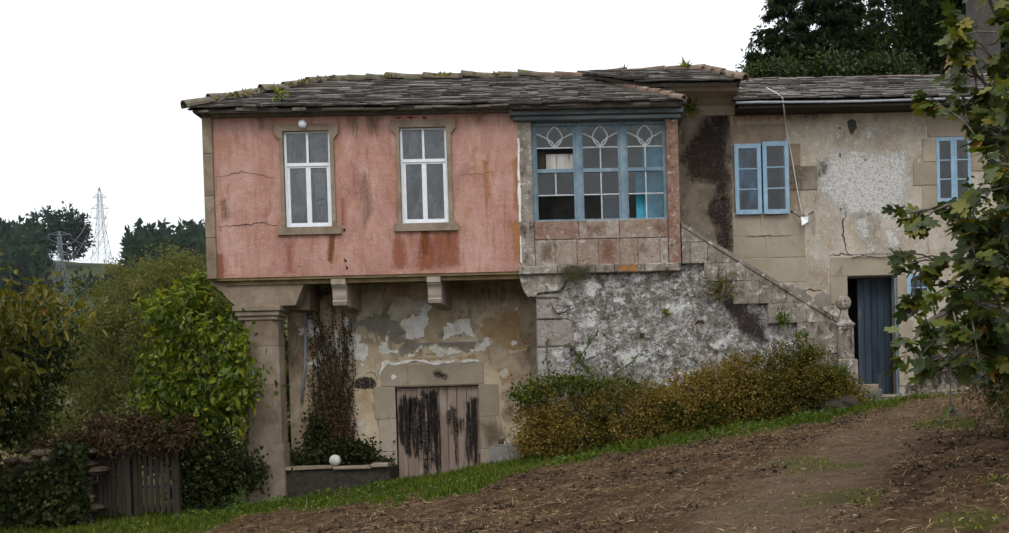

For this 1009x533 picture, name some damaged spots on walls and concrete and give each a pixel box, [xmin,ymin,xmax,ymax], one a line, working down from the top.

rust [393,237,406,269]
rust [419,231,460,268]
leakage [681,114,790,251]
crack [830,182,853,256]
peeling [292,291,530,389]